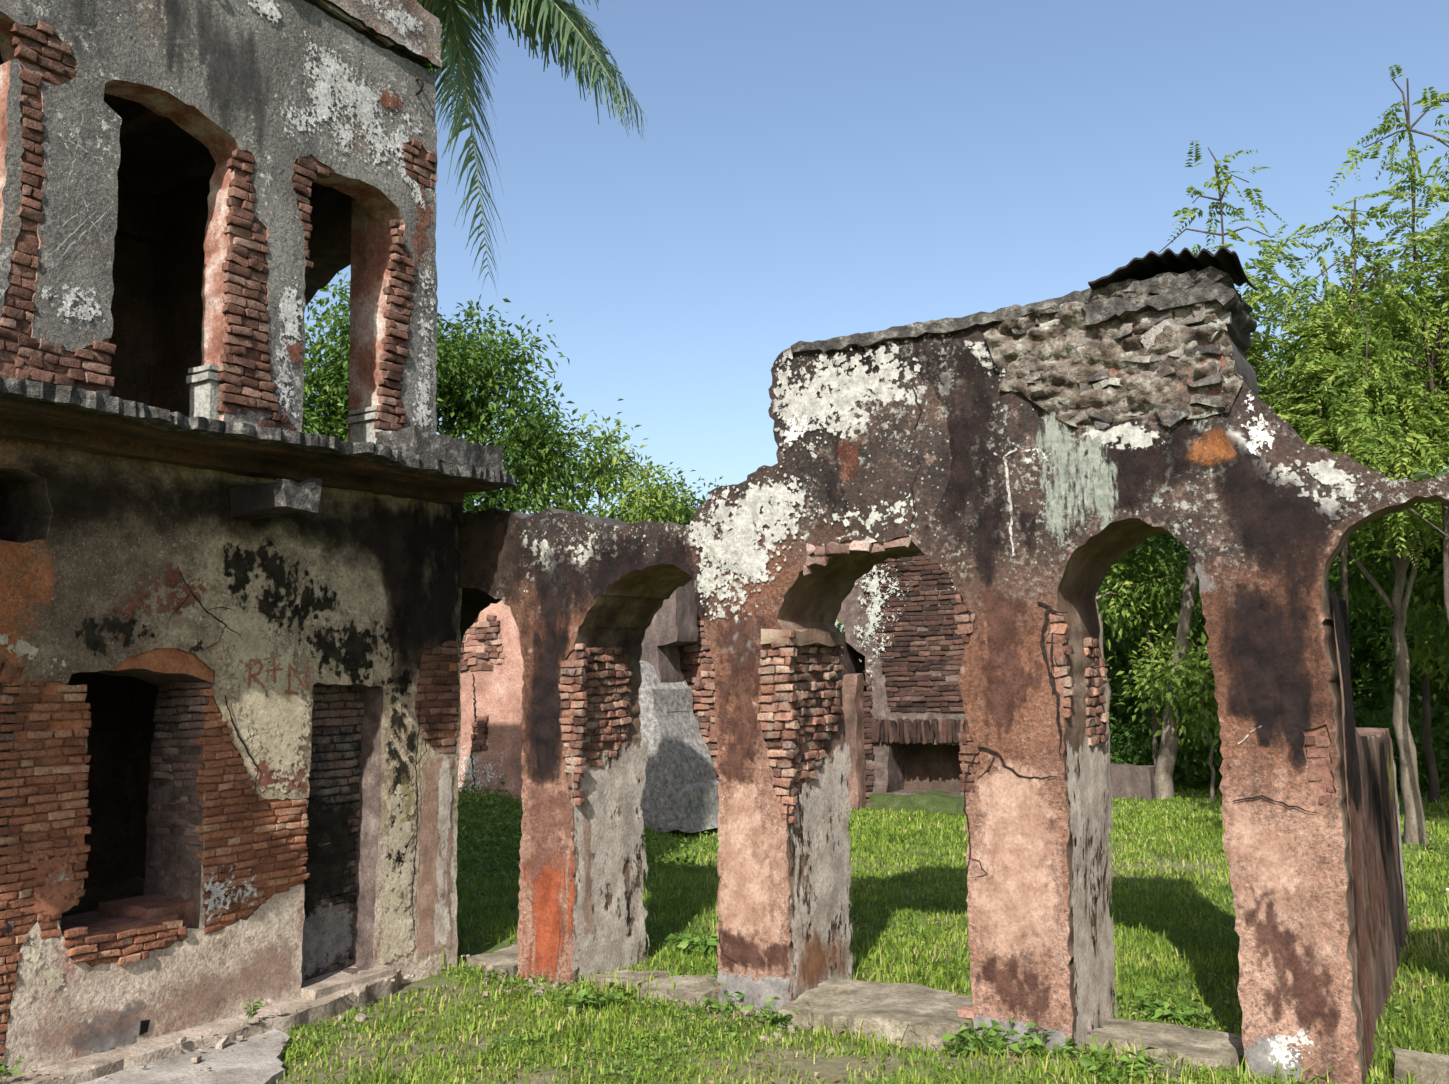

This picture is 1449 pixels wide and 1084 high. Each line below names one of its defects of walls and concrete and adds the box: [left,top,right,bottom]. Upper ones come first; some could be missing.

spalling [0,21,116,395]
spalling [216,31,438,438]
spalling [0,562,316,1073]
water stain [213,538,416,826]
water stain [385,843,408,870]
peeling [378,614,505,965]
water stain [516,536,769,782]
peeling [678,537,975,1001]
crack [963,601,1067,878]
crack [1233,795,1317,813]
water stain [1214,434,1342,769]